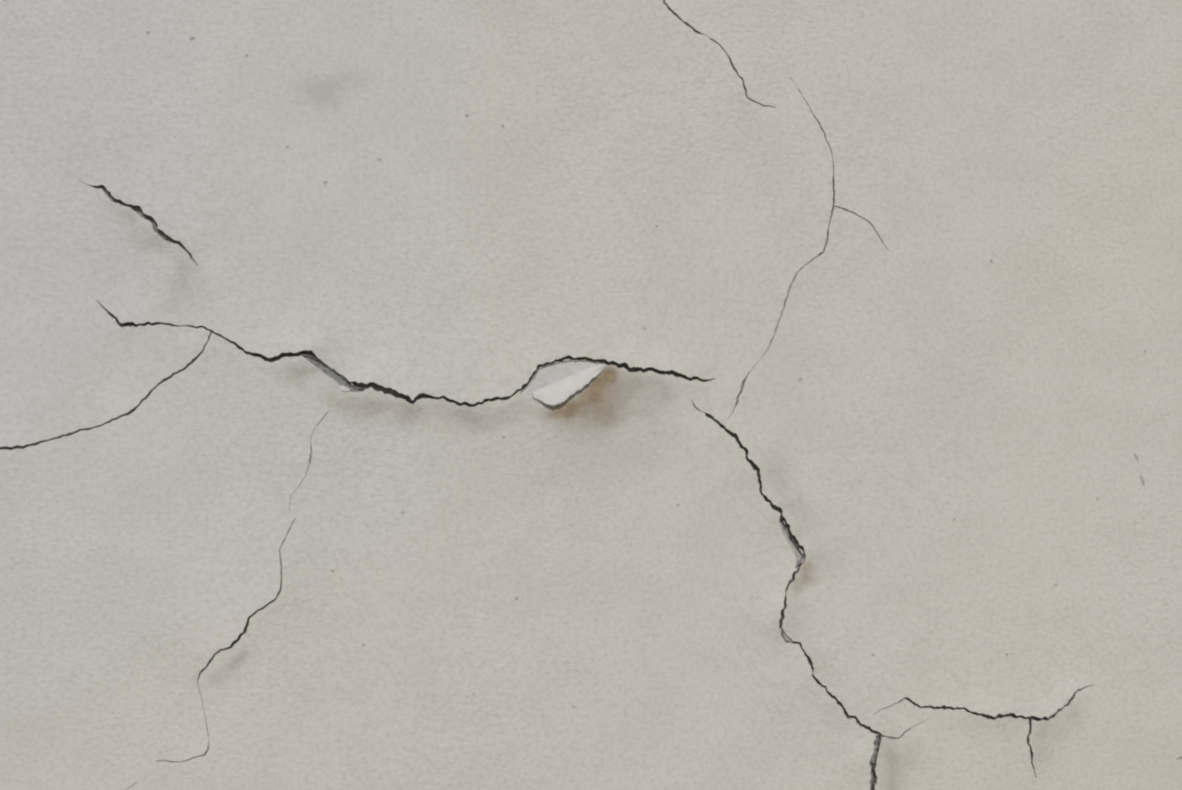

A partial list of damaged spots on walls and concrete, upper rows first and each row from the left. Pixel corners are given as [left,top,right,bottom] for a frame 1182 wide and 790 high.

crack [663,0,776,108]
crack [85,183,198,266]
crack [0,300,716,450]
peeling [520,360,607,406]
crack [691,89,1094,790]
crack [156,412,328,762]